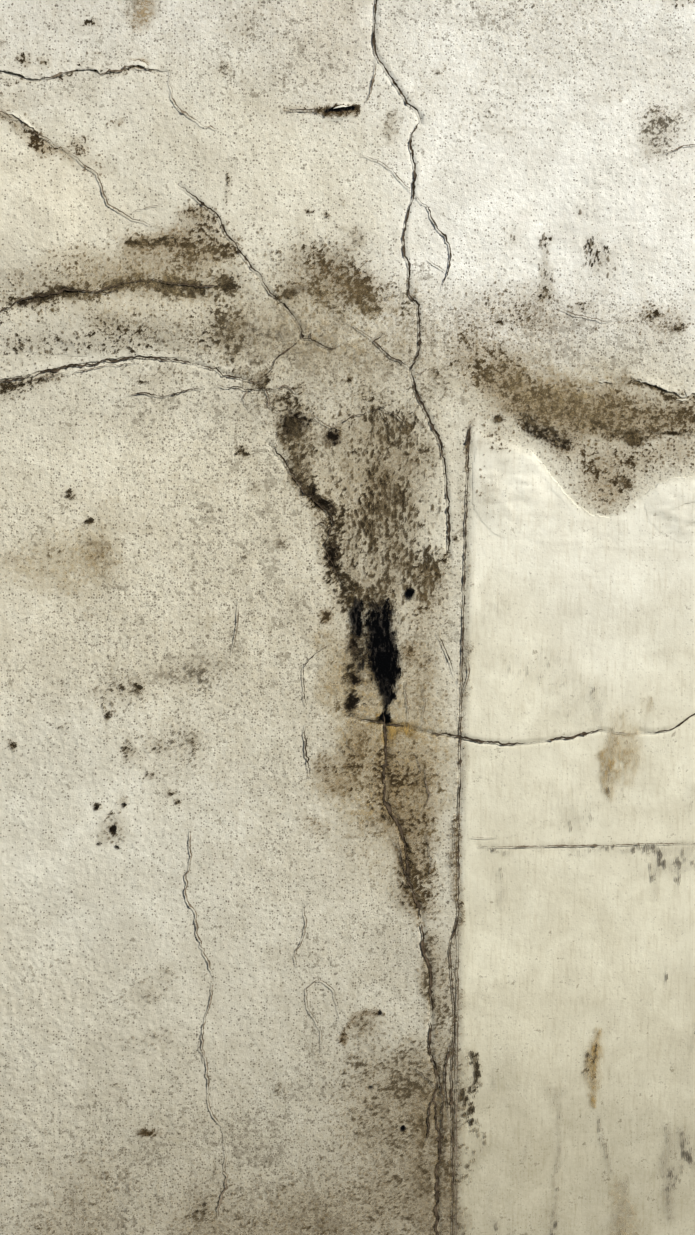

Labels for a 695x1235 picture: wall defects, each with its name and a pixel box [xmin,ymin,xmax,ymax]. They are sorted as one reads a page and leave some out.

crack [0,111,160,224]
crack [14,65,215,129]
spalling [288,101,361,123]
crack [0,187,344,413]
damp [0,173,417,330]
damp [443,233,695,515]
crack [274,448,343,586]
crack [346,0,695,1235]
mould [81,674,146,720]
mould [121,729,205,792]
damp [257,385,489,1235]
crack [185,831,228,1220]